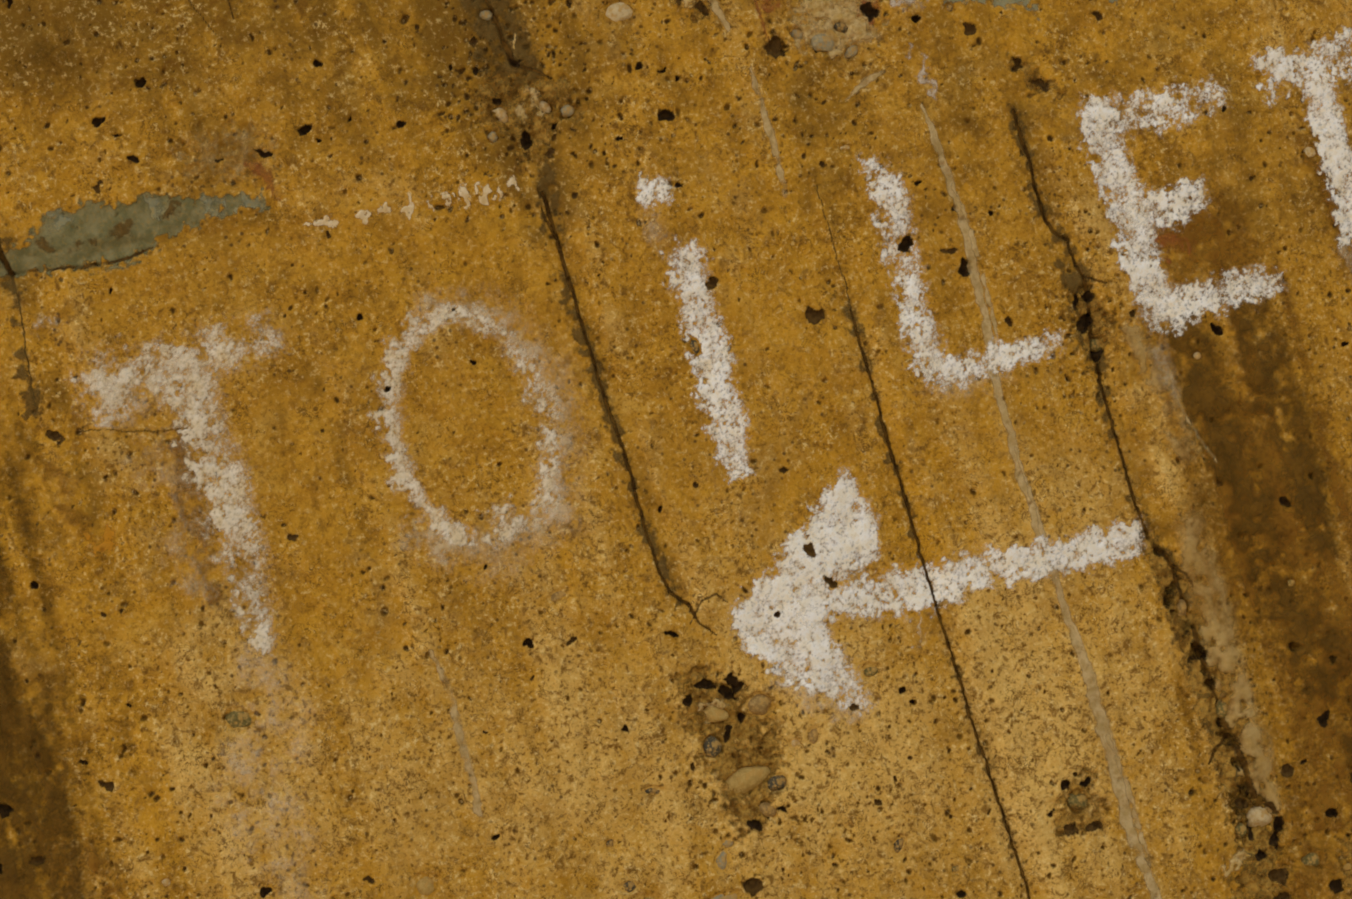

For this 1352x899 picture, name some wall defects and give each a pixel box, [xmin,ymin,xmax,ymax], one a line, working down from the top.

spalling [670,0,711,23]
spalling [791,0,888,59]
peeling [0,128,273,278]
leakage [1296,131,1352,272]
crack [536,163,726,636]
crack [816,186,1030,899]
crack [1009,107,1273,899]
leakage [1145,192,1352,899]
spalling [673,666,818,870]